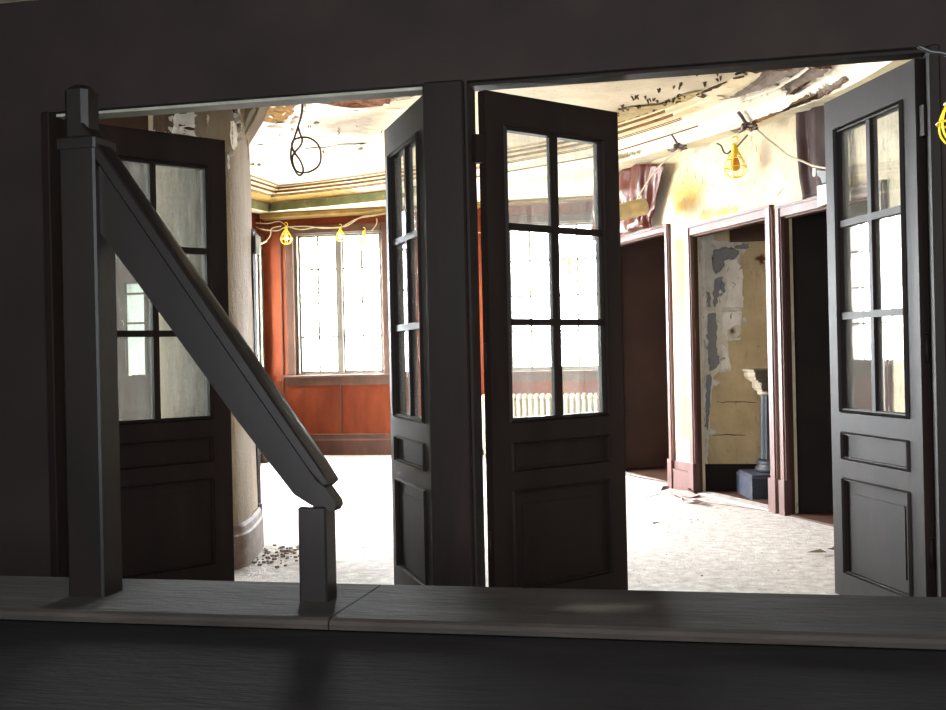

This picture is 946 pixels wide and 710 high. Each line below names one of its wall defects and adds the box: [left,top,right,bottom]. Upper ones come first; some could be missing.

spalling [614,65,847,122]
peeling [227,98,397,170]
peeling [700,240,749,436]